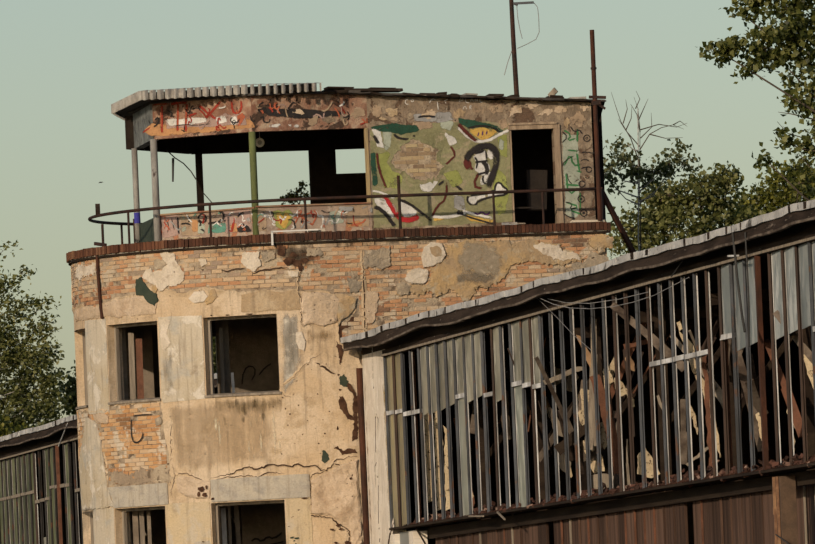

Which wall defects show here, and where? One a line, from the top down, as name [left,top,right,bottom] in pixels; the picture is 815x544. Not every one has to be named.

flaking render [387,135,449,185]
flaking render [70,233,614,368]
flaking render [76,401,174,511]
crack [176,253,394,544]
flaking render [318,374,359,463]